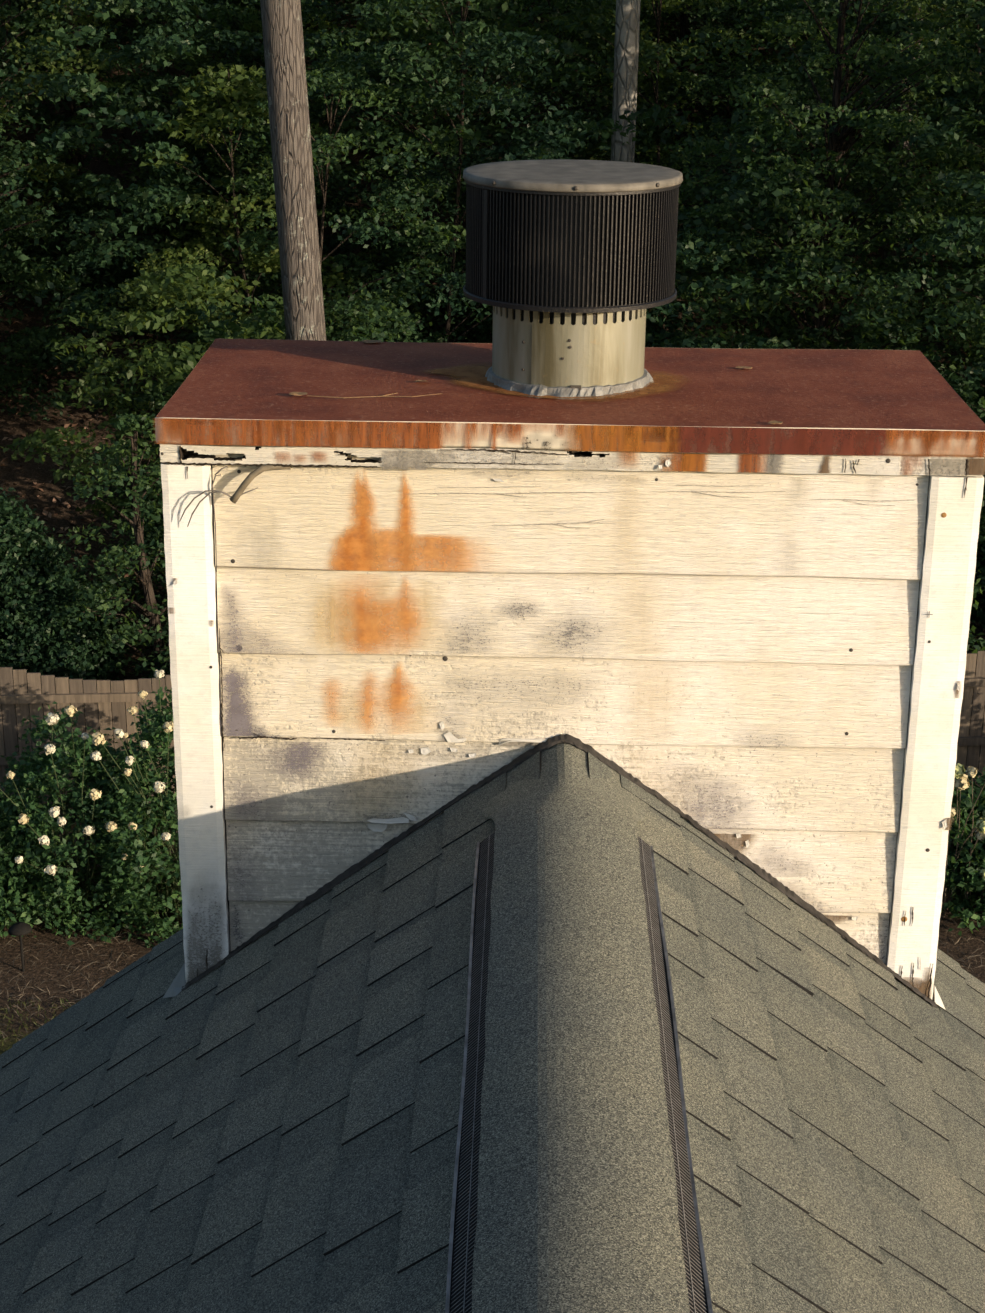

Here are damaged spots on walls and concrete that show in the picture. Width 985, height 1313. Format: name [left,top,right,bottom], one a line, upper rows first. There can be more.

rust [593,374,679,398]
crack [160,446,377,479]
rust [160,418,524,459]
rust [557,425,985,473]
rust [329,479,461,652]
rust [363,668,409,725]